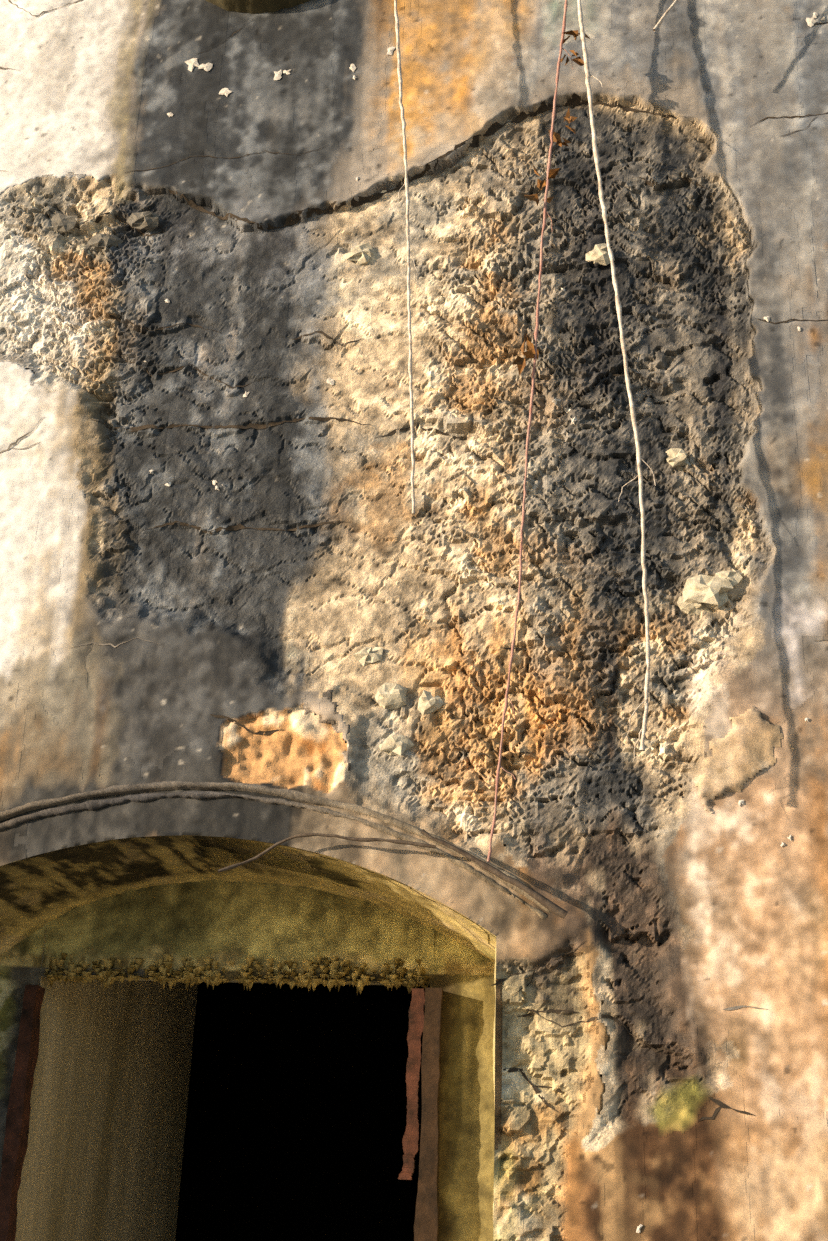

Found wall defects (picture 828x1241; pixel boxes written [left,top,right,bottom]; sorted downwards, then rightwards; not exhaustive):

crack [8,0,82,16]
rust [377,0,534,187]
crack [755,112,828,136]
spalling [0,176,222,382]
spalling [586,243,615,265]
crack [0,422,39,453]
damp [0,0,541,1018]
spalling [91,155,530,847]
spalling [677,570,746,622]
rust [795,390,828,601]
rust [777,715,828,902]
rust [515,1016,828,1241]